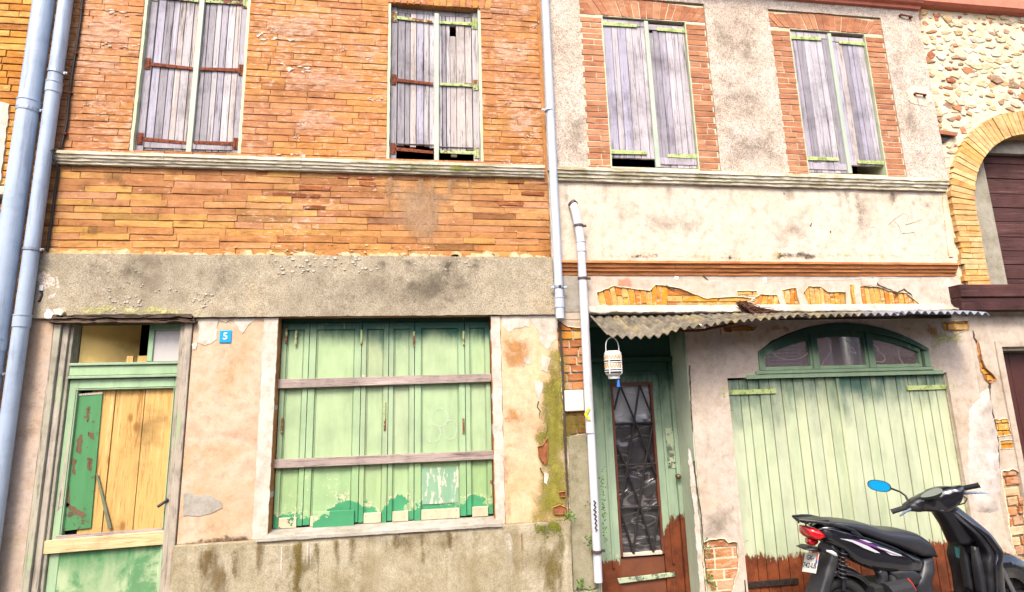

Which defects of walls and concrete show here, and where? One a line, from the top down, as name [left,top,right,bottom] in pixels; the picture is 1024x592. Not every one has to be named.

spalling [596,276,919,306]
peeling [192,293,255,350]
flaking render [502,315,587,438]
spalling [977,342,997,384]
spalling [993,418,1014,450]
spalling [537,438,549,501]
spalling [552,491,567,514]
spalling [688,448,740,592]
spalling [1001,468,1024,561]
damp [281,542,319,592]